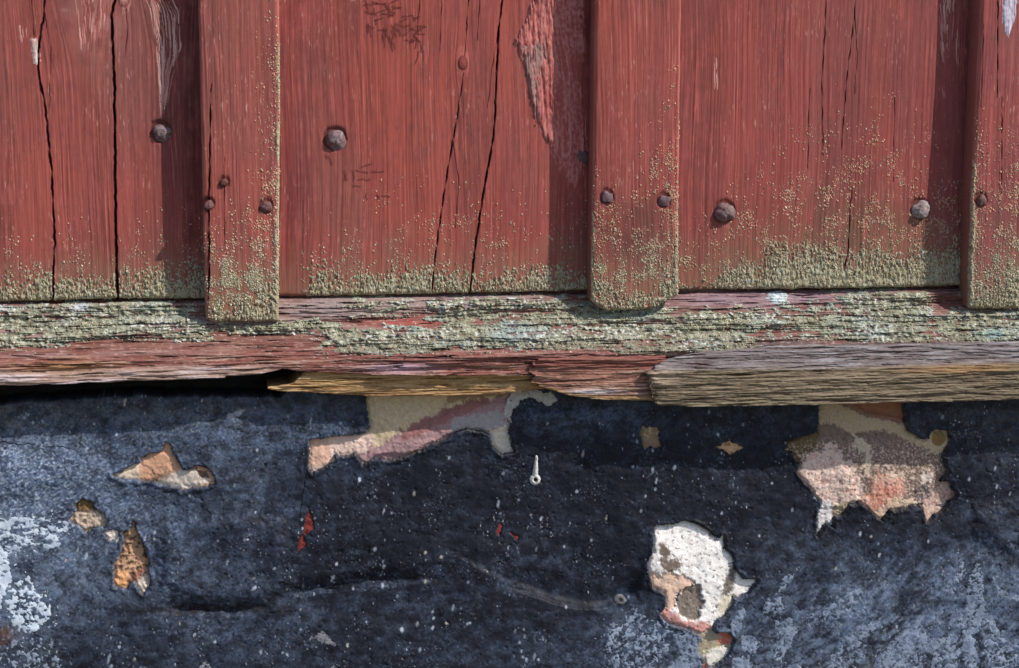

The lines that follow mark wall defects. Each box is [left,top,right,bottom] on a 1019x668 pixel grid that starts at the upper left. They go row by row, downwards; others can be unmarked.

crack [31,0,56,302]
crack [110,0,128,300]
crack [432,1,503,294]
peeling [514,0,588,189]
peeling [1002,0,1018,38]
spalling [113,442,215,490]
spalling [309,390,558,473]
spalling [785,402,955,535]
peeling [0,498,150,668]
spalling [594,521,1019,668]